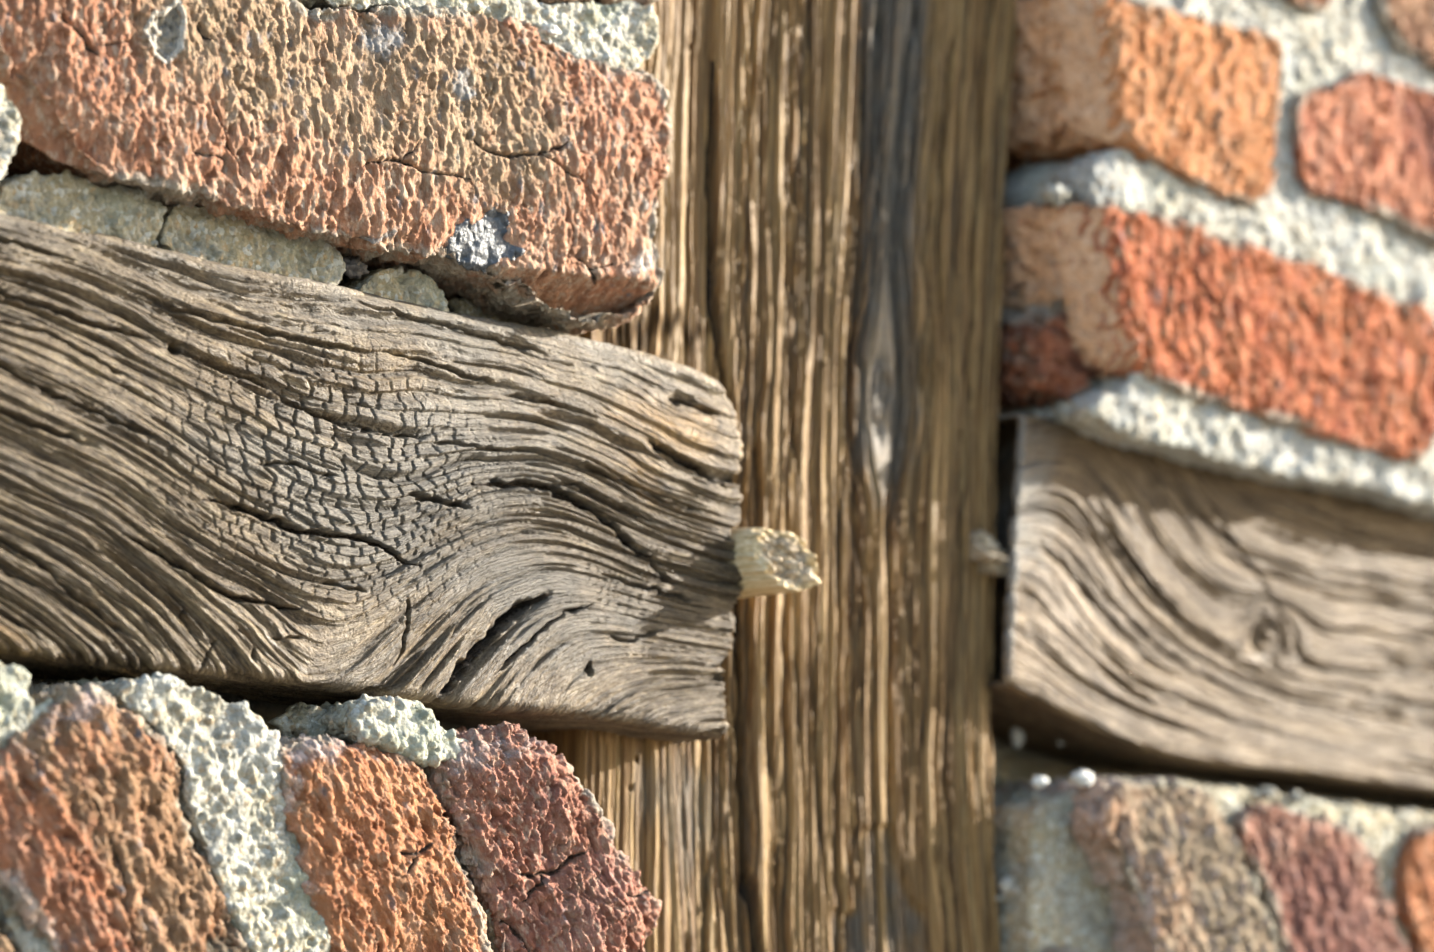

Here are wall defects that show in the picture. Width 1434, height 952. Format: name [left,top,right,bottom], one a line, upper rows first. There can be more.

crack [363,136,584,183]
crack [437,593,593,696]
crack [500,850,587,949]